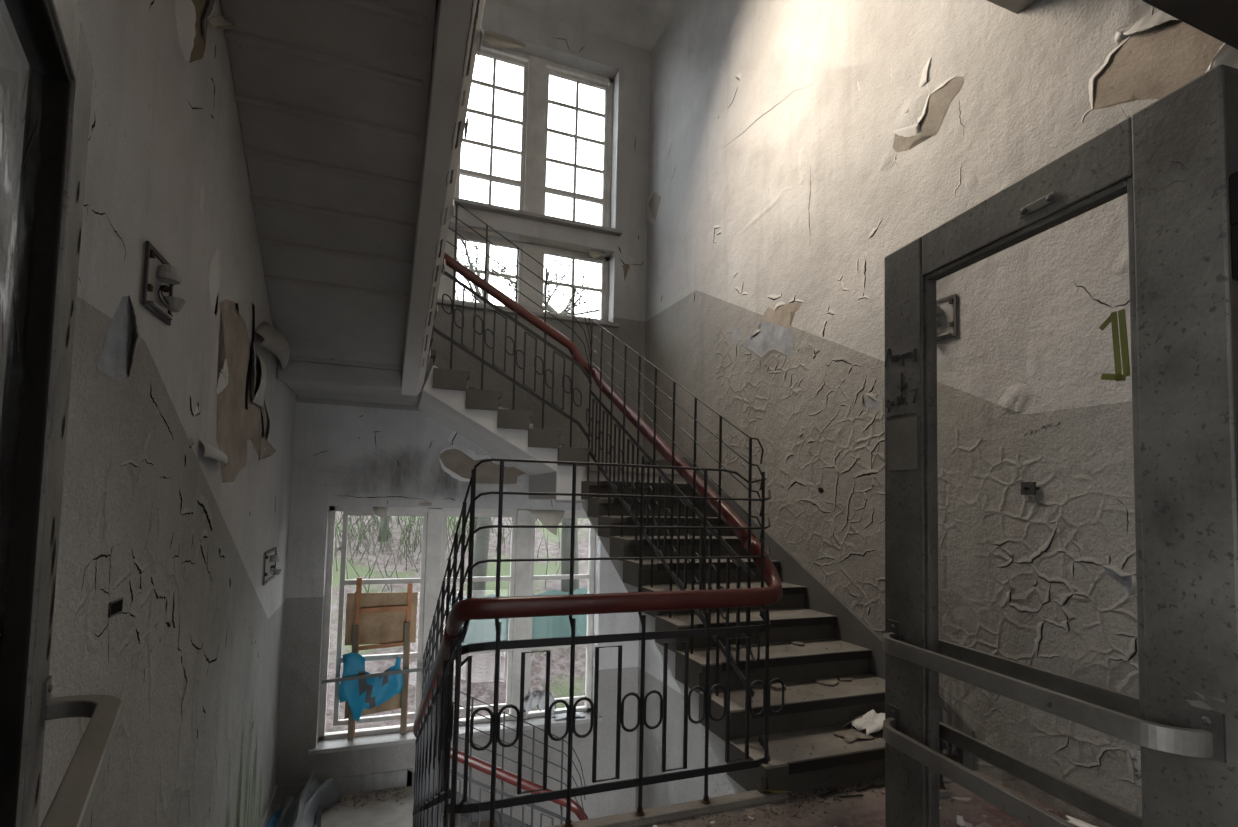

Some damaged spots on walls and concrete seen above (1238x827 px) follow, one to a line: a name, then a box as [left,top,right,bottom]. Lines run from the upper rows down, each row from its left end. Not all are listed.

peeling [175,0,216,63]
peeling [892,57,964,152]
peeling [1088,11,1224,109]
crack [713,225,721,243]
peeling [97,295,140,381]
peeling [200,248,290,498]
crack [733,219,885,615]
crack [1074,282,1130,308]
peeling [439,444,525,492]
crack [82,387,256,739]
crack [992,498,1137,659]
crack [1108,631,1139,670]